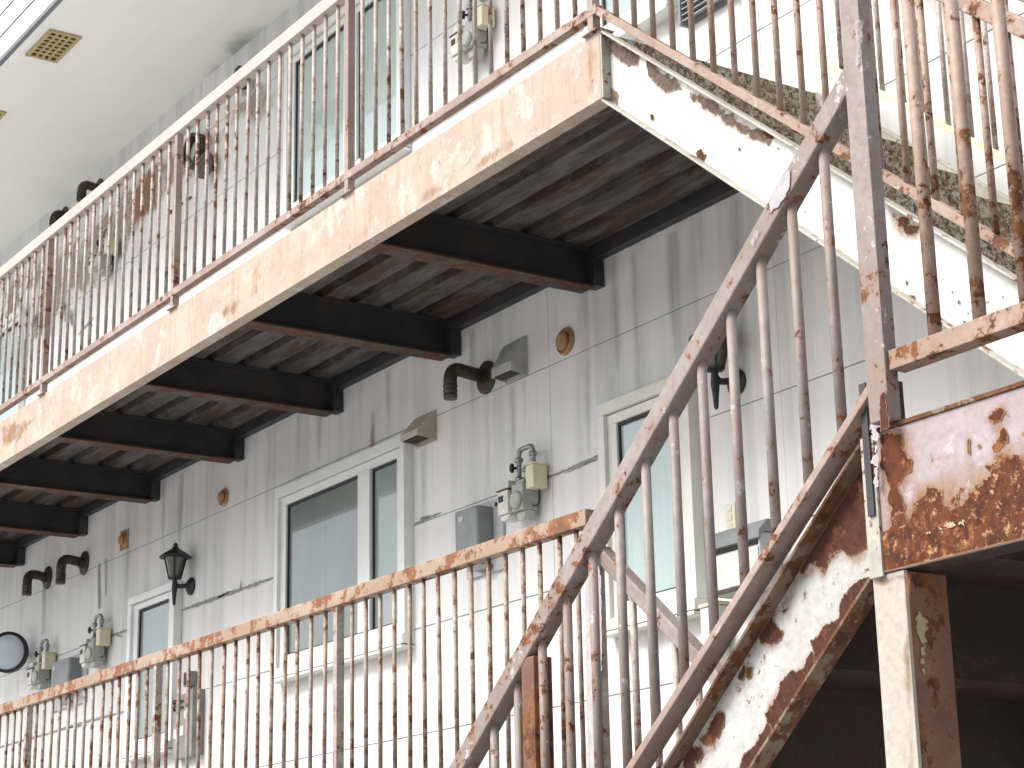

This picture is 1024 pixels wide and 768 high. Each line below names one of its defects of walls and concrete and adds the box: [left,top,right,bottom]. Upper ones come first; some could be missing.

rust [682,710,724,768]
rust [737,389,1024,768]